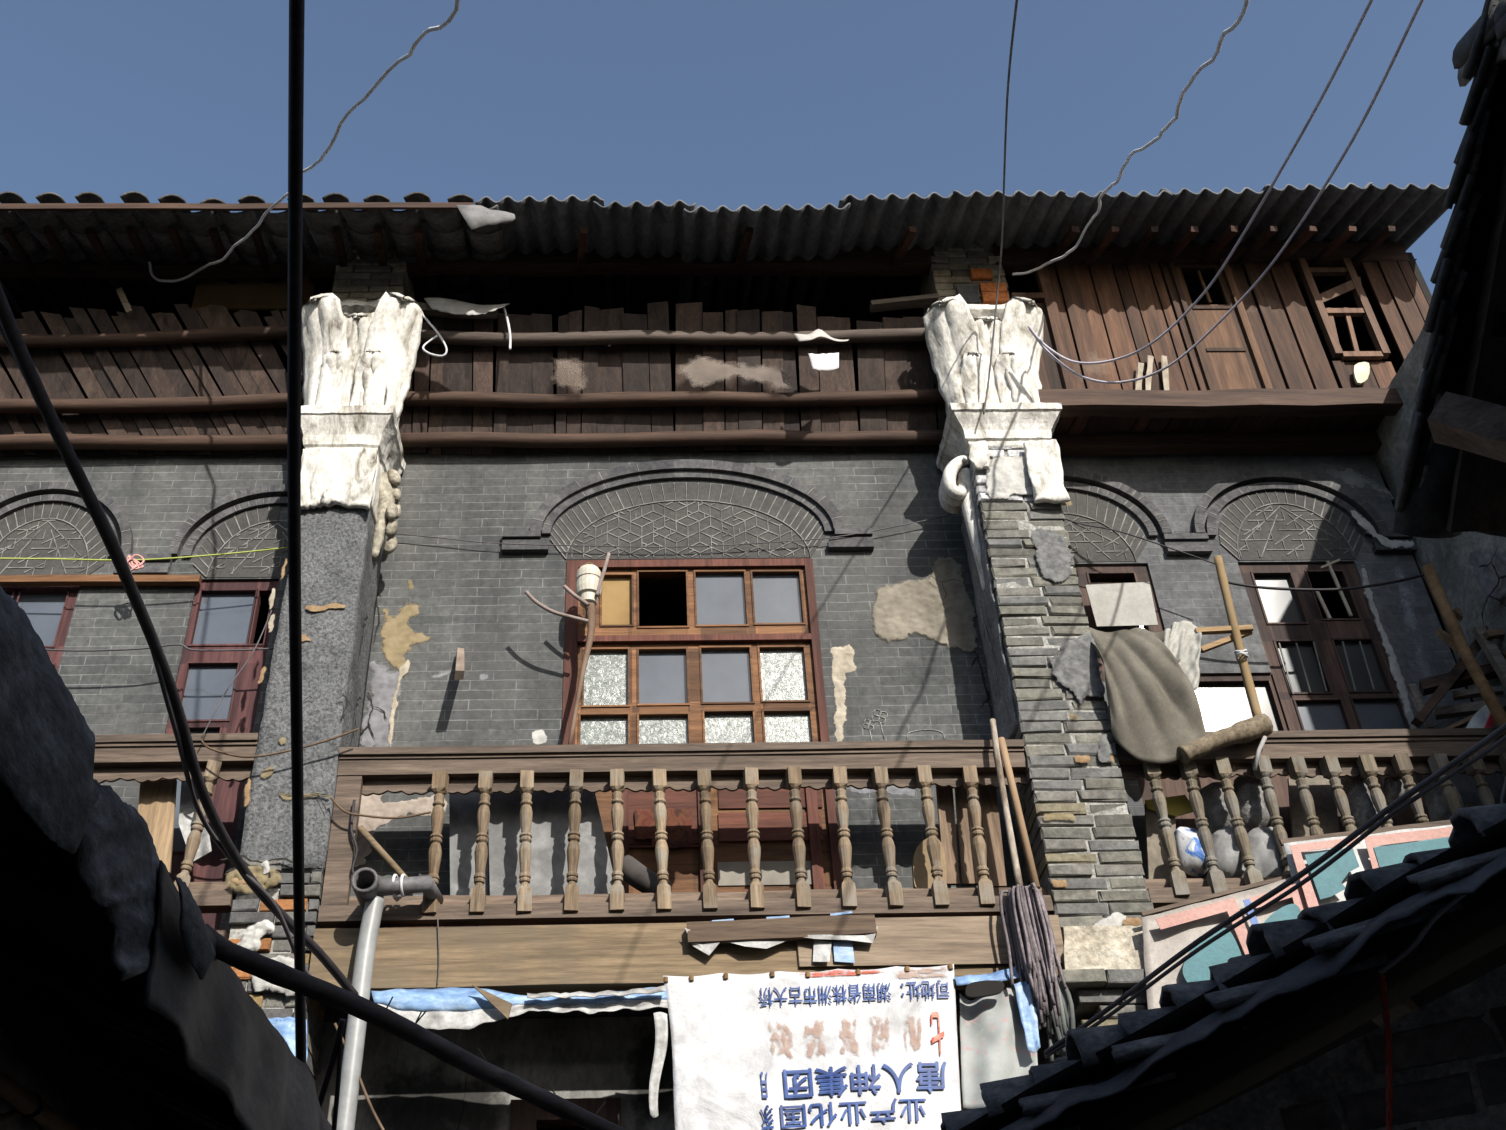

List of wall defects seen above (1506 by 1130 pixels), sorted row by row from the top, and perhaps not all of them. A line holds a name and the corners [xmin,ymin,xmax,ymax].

crack [1479,547,1506,626]
flaking render [359,580,431,747]
flaking render [830,644,857,741]